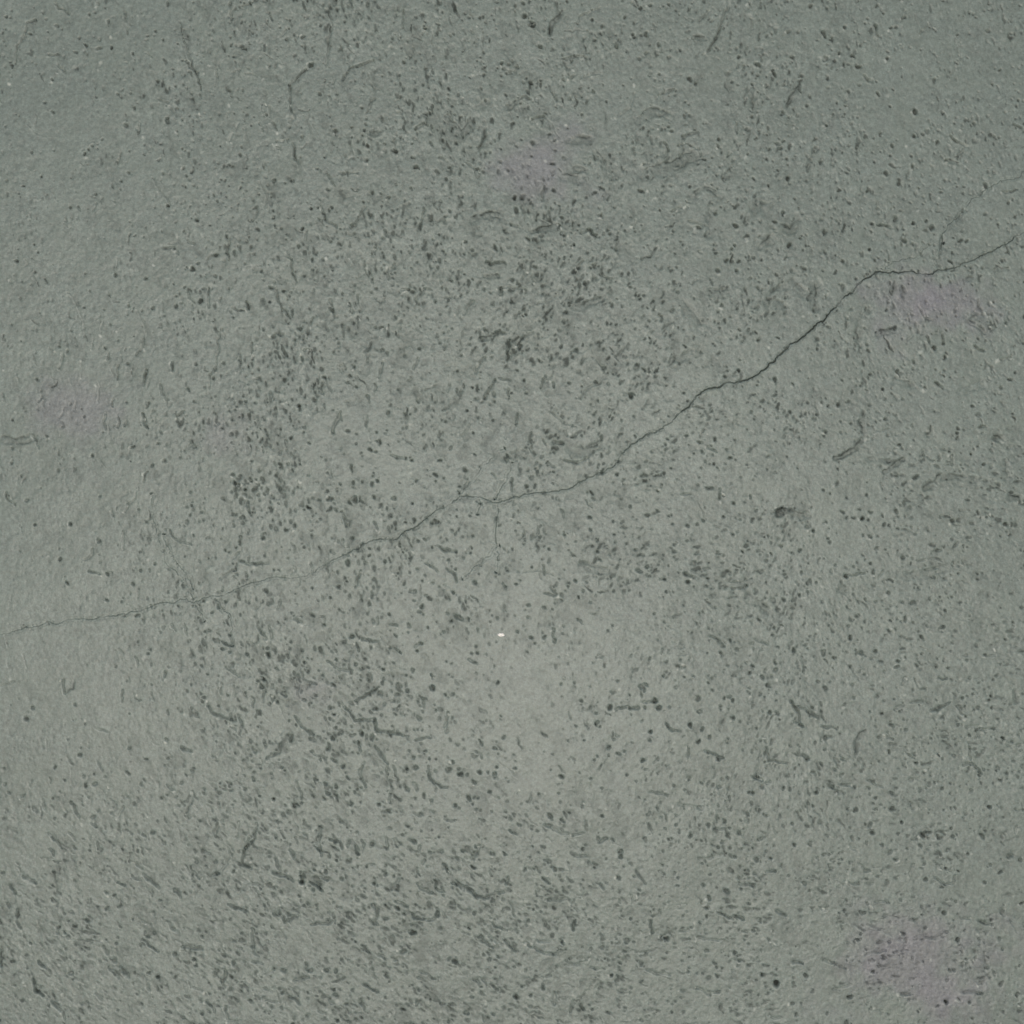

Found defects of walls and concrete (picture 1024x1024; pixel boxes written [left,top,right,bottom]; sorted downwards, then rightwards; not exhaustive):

crack [0,169,1024,646]